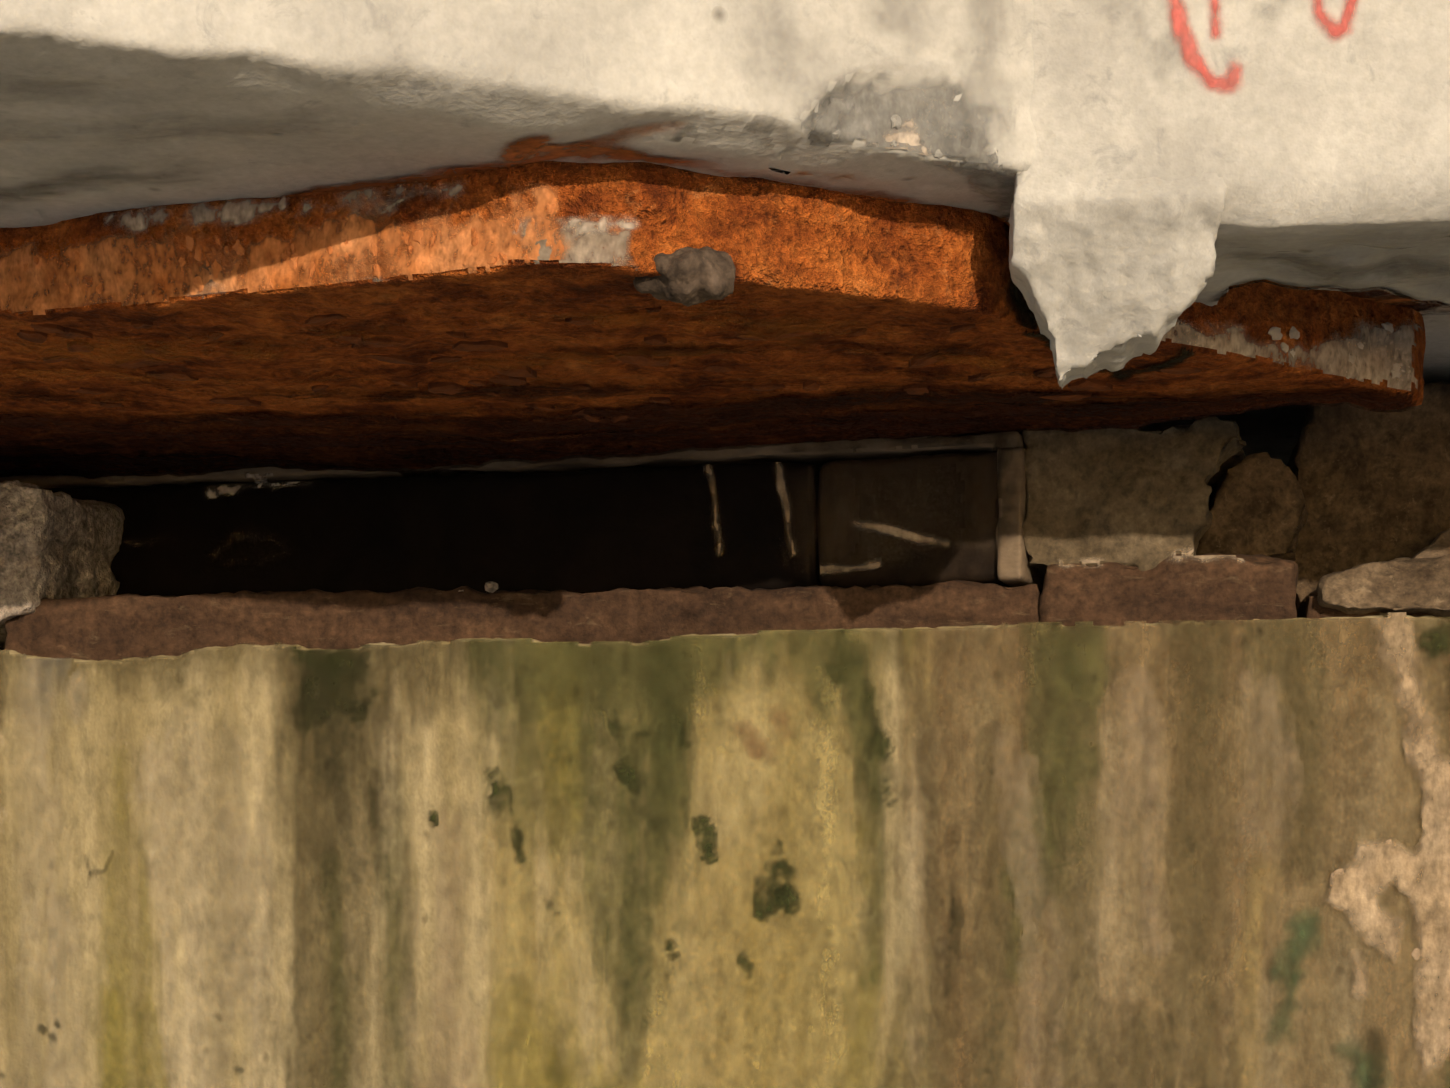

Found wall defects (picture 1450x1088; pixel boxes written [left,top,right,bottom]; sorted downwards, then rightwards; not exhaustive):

rust [0,127,695,315]
rust [1161,287,1450,391]
leakage [0,650,80,707]
leakage [762,629,875,711]
leakage [869,726,890,762]
leakage [263,640,450,1088]
leakage [900,613,1450,1088]